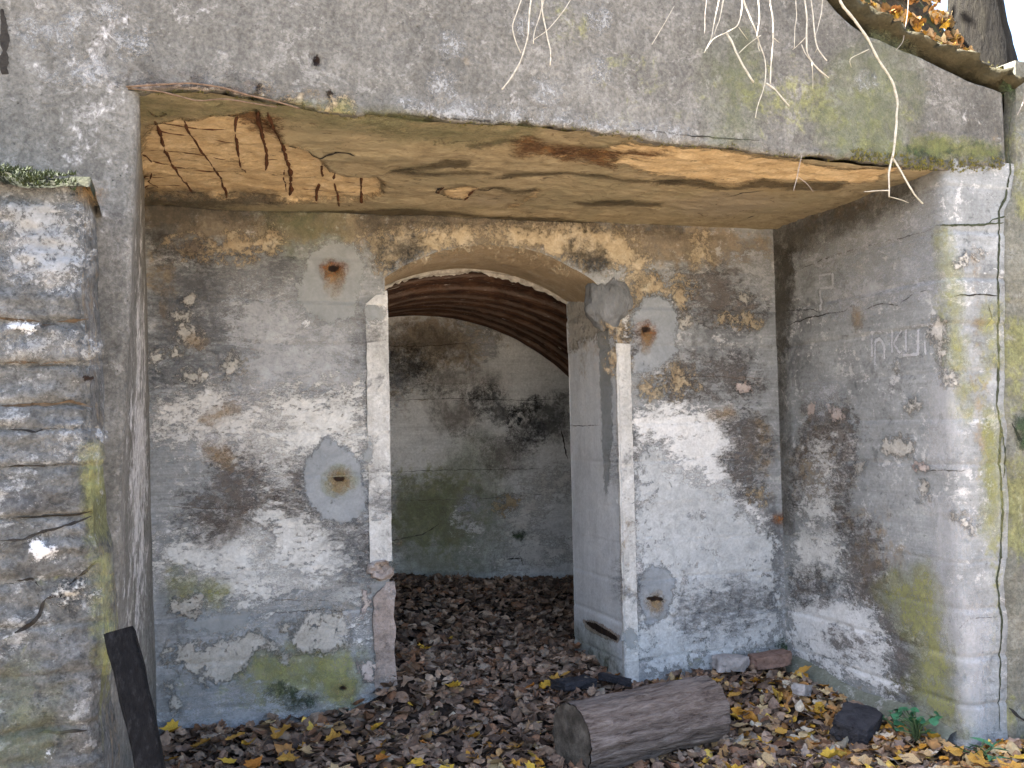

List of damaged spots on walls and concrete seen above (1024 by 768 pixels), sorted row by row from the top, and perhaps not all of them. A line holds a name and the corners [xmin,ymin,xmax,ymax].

rust [228,109,284,139]
rust [319,262,345,285]
water stain [145,187,585,252]
water stain [565,238,610,271]
water stain [148,254,300,392]
rust [637,322,656,349]
water stain [773,181,914,532]
flaking render [127,72,904,733]
crack [787,105,1024,729]
flaking render [880,431,932,505]
crack [0,511,92,542]
crack [5,561,96,633]